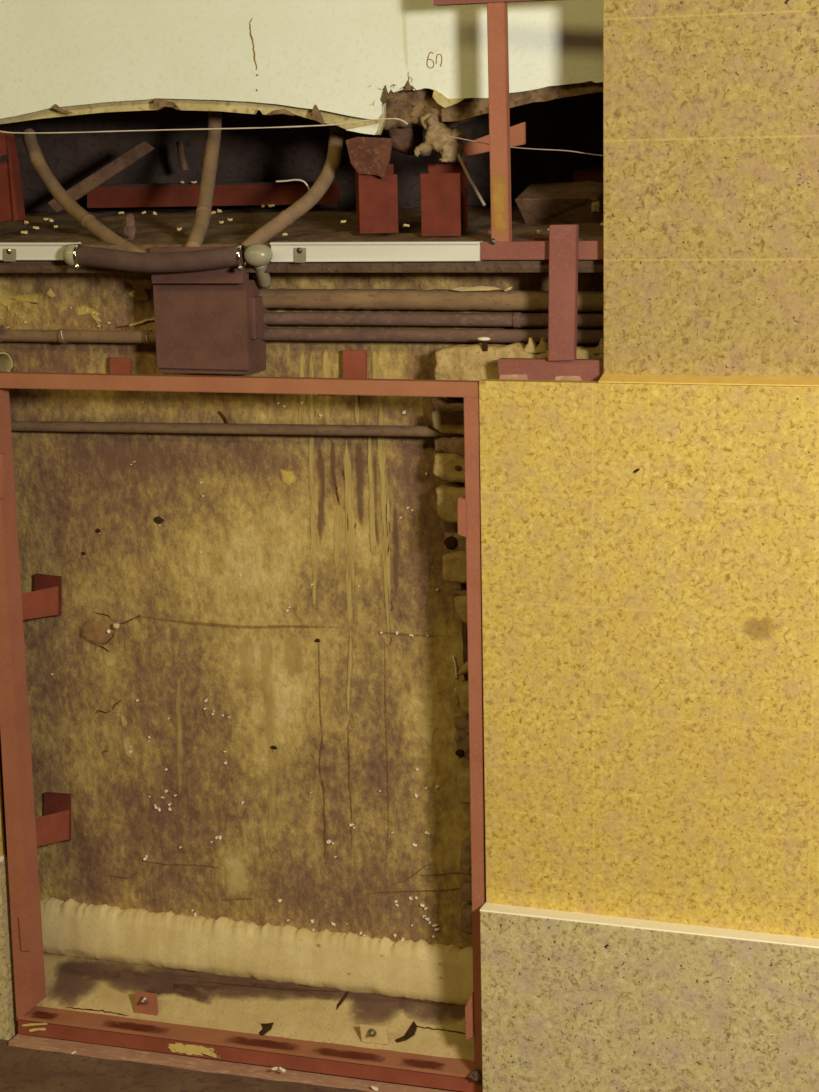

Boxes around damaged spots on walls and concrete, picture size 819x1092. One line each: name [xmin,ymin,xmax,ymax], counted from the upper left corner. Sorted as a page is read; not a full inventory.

spalling [0,80,489,155]
spalling [509,81,603,108]
leakage [300,350,331,378]
leakage [298,394,399,710]